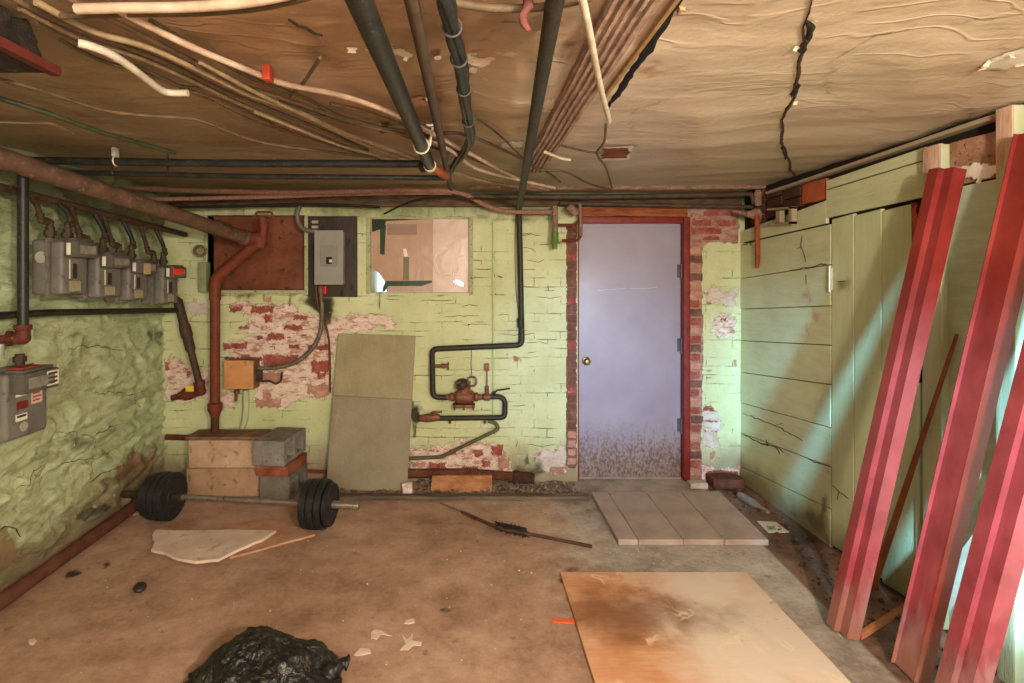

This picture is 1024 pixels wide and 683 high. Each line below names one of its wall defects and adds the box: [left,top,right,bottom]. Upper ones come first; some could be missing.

crack [779,0,818,177]
peeling [978,48,1024,71]
peeling [184,299,210,317]
peeling [164,353,238,412]
peeling [222,296,396,411]
spalling [689,208,740,481]
peeling [410,437,512,472]
crack [741,413,849,500]